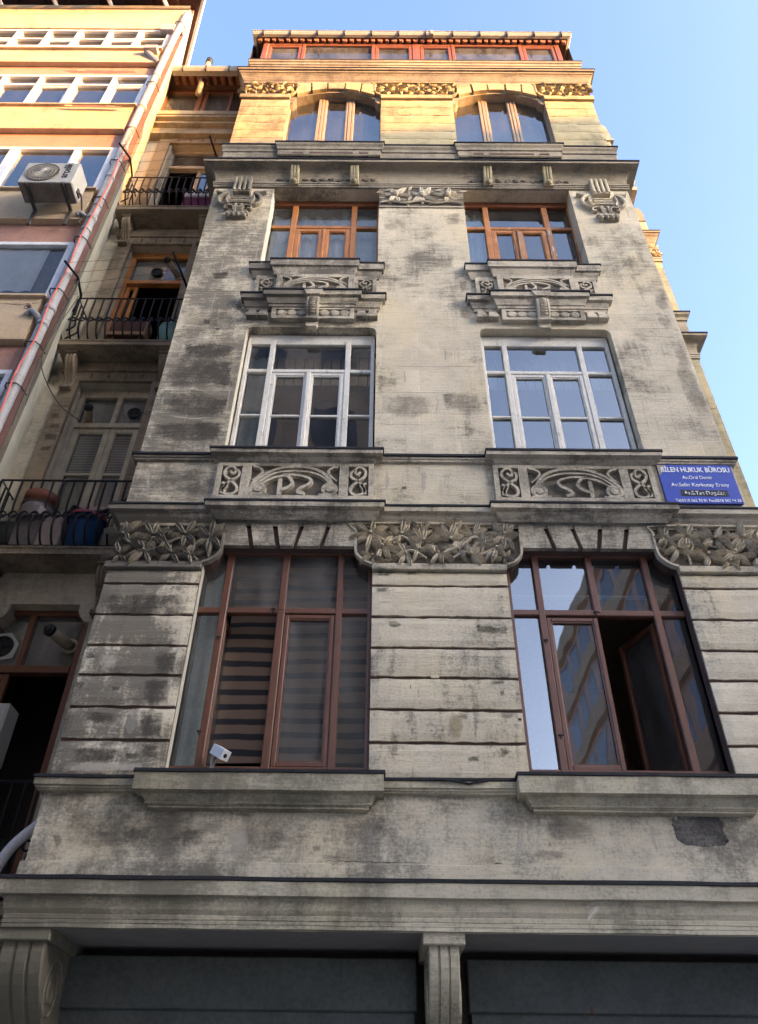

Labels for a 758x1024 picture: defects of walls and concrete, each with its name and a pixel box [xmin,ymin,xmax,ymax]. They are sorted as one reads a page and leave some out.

spalling [672,816,729,847]